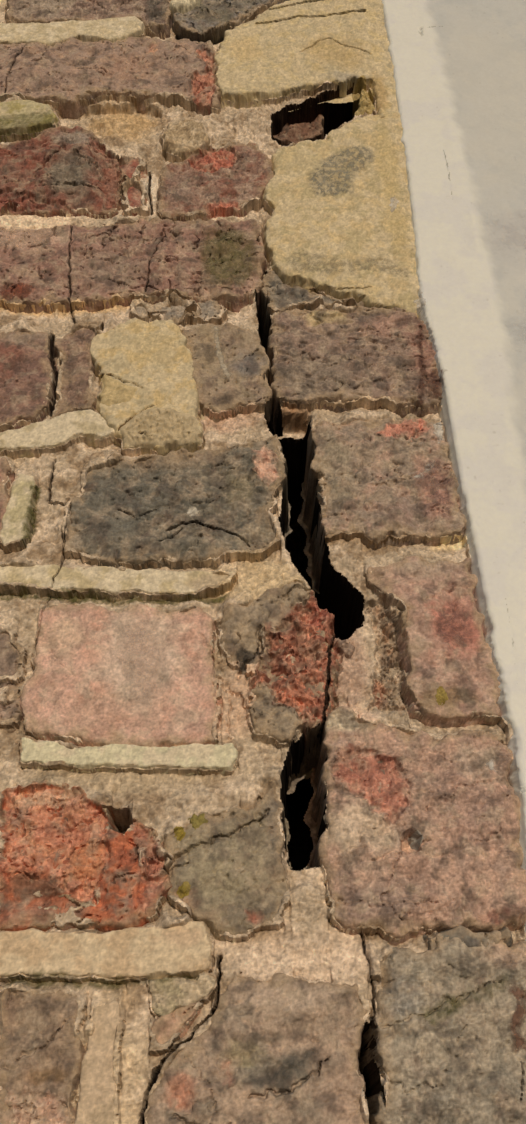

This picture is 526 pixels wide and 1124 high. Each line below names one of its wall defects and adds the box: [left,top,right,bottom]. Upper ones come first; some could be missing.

crack [255,268,365,871]
crack [361,934,386,1121]